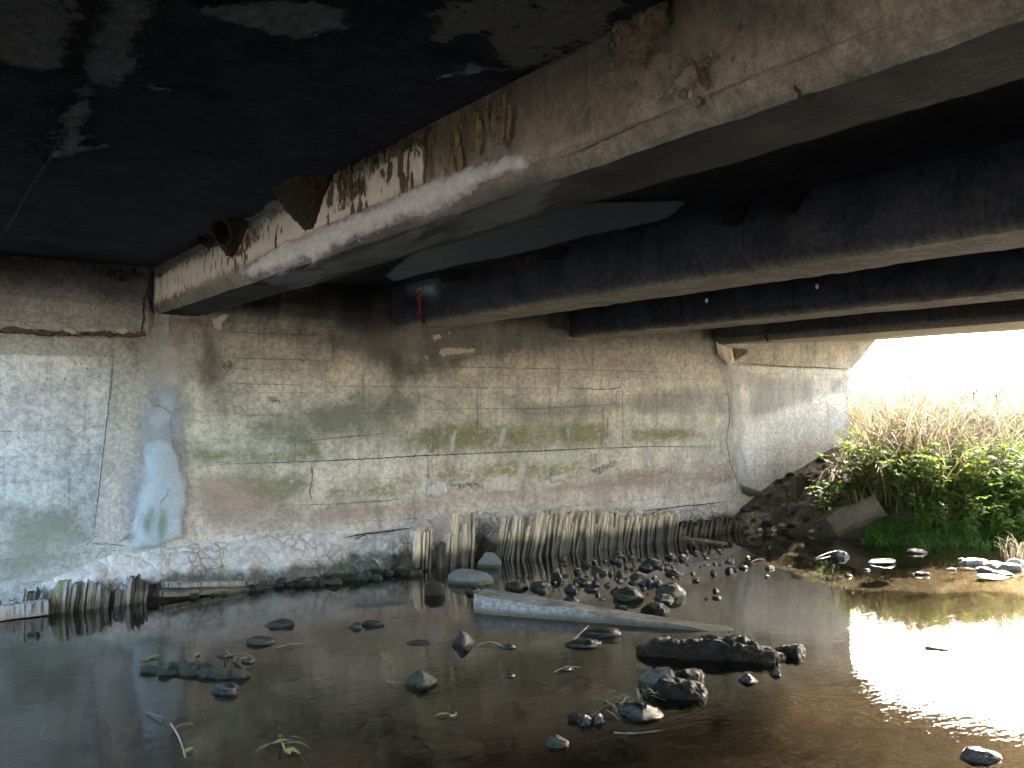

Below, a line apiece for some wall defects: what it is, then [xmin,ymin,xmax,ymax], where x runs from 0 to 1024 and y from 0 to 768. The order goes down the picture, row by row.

peeling [421,0,713,107]
leakage [154,144,426,305]
crack [0,329,115,337]
spalling [424,332,476,360]
leakage [146,391,179,436]
leakage [258,403,388,442]
crack [93,367,127,547]